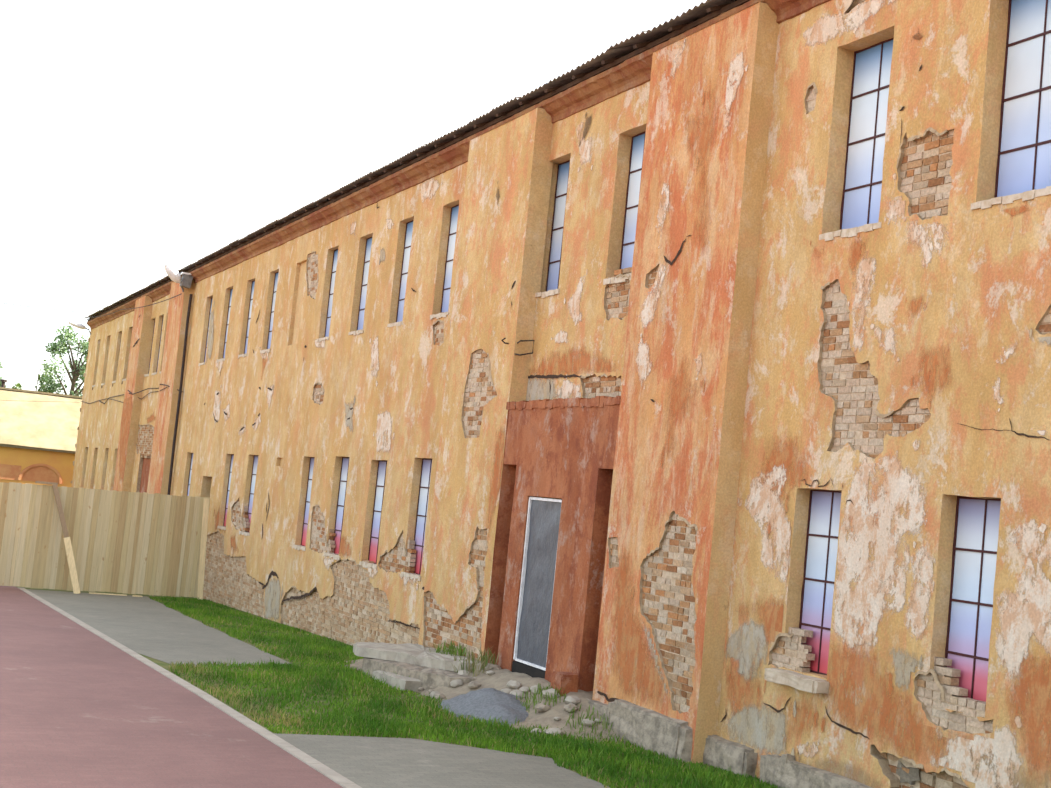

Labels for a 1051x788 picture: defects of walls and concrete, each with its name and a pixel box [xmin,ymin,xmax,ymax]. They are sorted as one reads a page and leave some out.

spalling [884,127,954,265]
spalling [307,251,319,299]
spalling [463,349,497,438]
spalling [556,373,621,399]
spalling [606,265,666,389]
peeling [820,257,936,649]
spalling [1039,307,1051,335]
spalling [281,504,494,659]
spalling [642,513,698,713]
spalling [769,627,815,672]
peeling [995,519,1051,679]
spalling [879,657,1023,788]